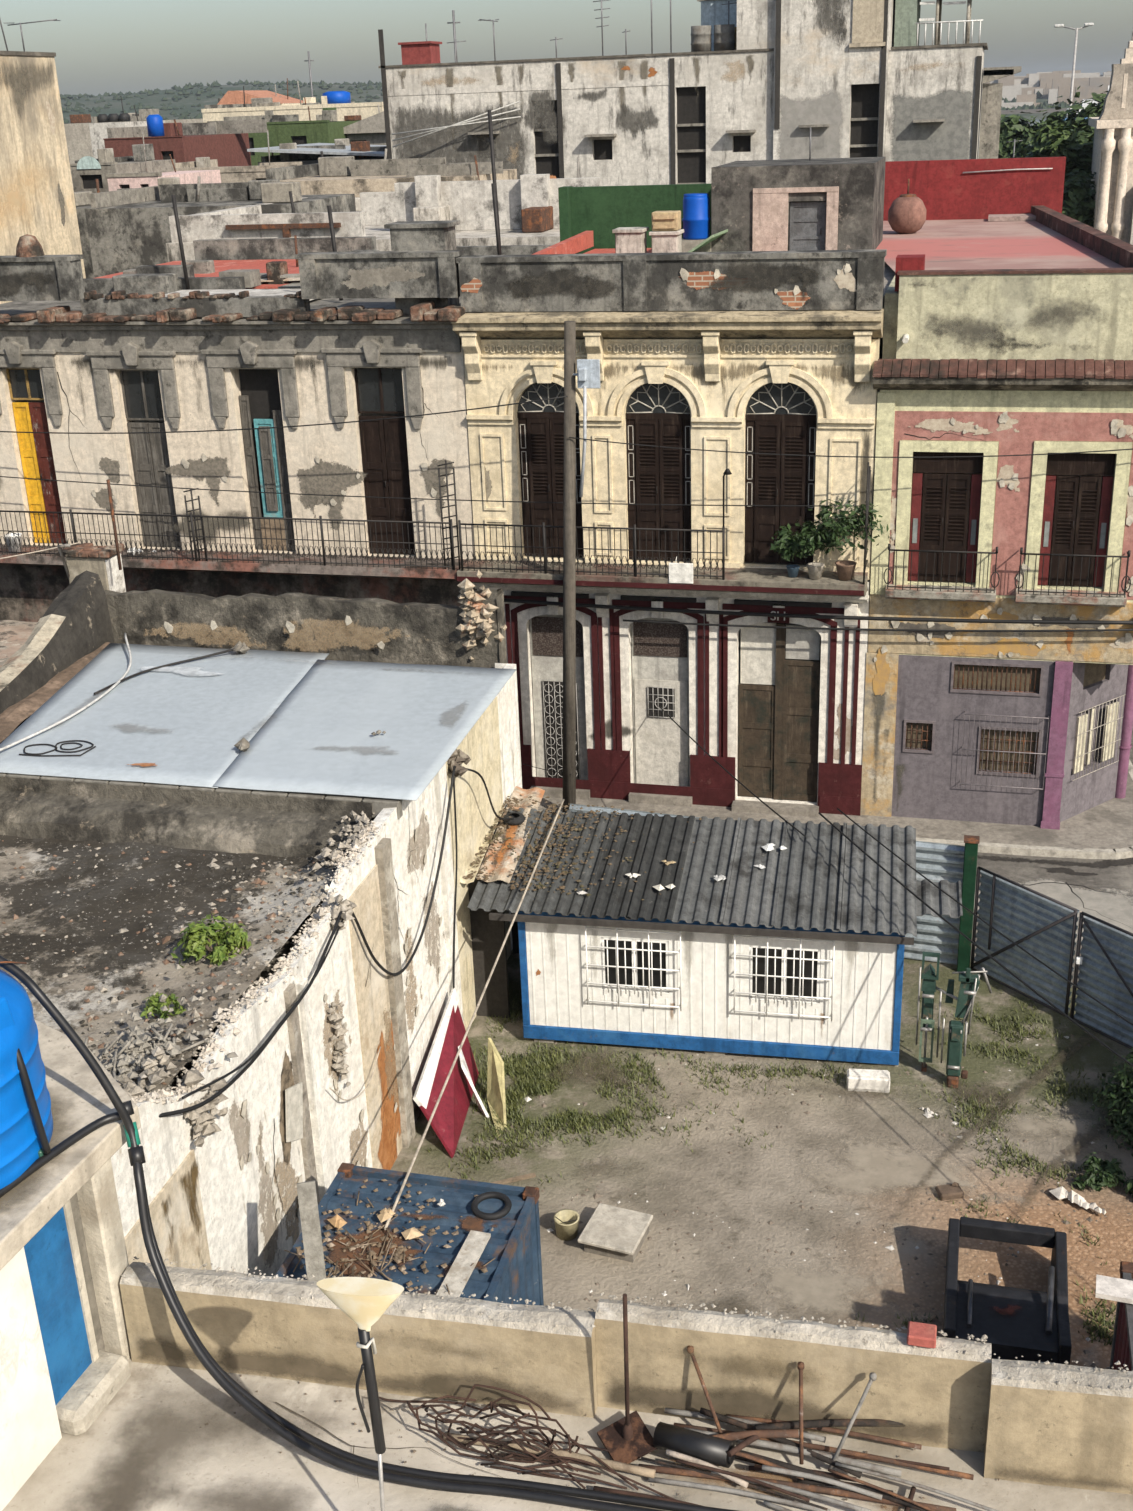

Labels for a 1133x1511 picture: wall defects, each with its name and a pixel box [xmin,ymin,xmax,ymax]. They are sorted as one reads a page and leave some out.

leakage [814,0,850,40]
leakage [0,65,53,114]
spalling [679,268,726,290]
spalling [774,285,810,310]
leakage [933,318,1032,347]
leakage [1031,307,1092,326]
peeling [908,411,1019,435]
rust [496,825,517,865]
peeling [323,990,352,1101]
rust [378,1091,397,1170]